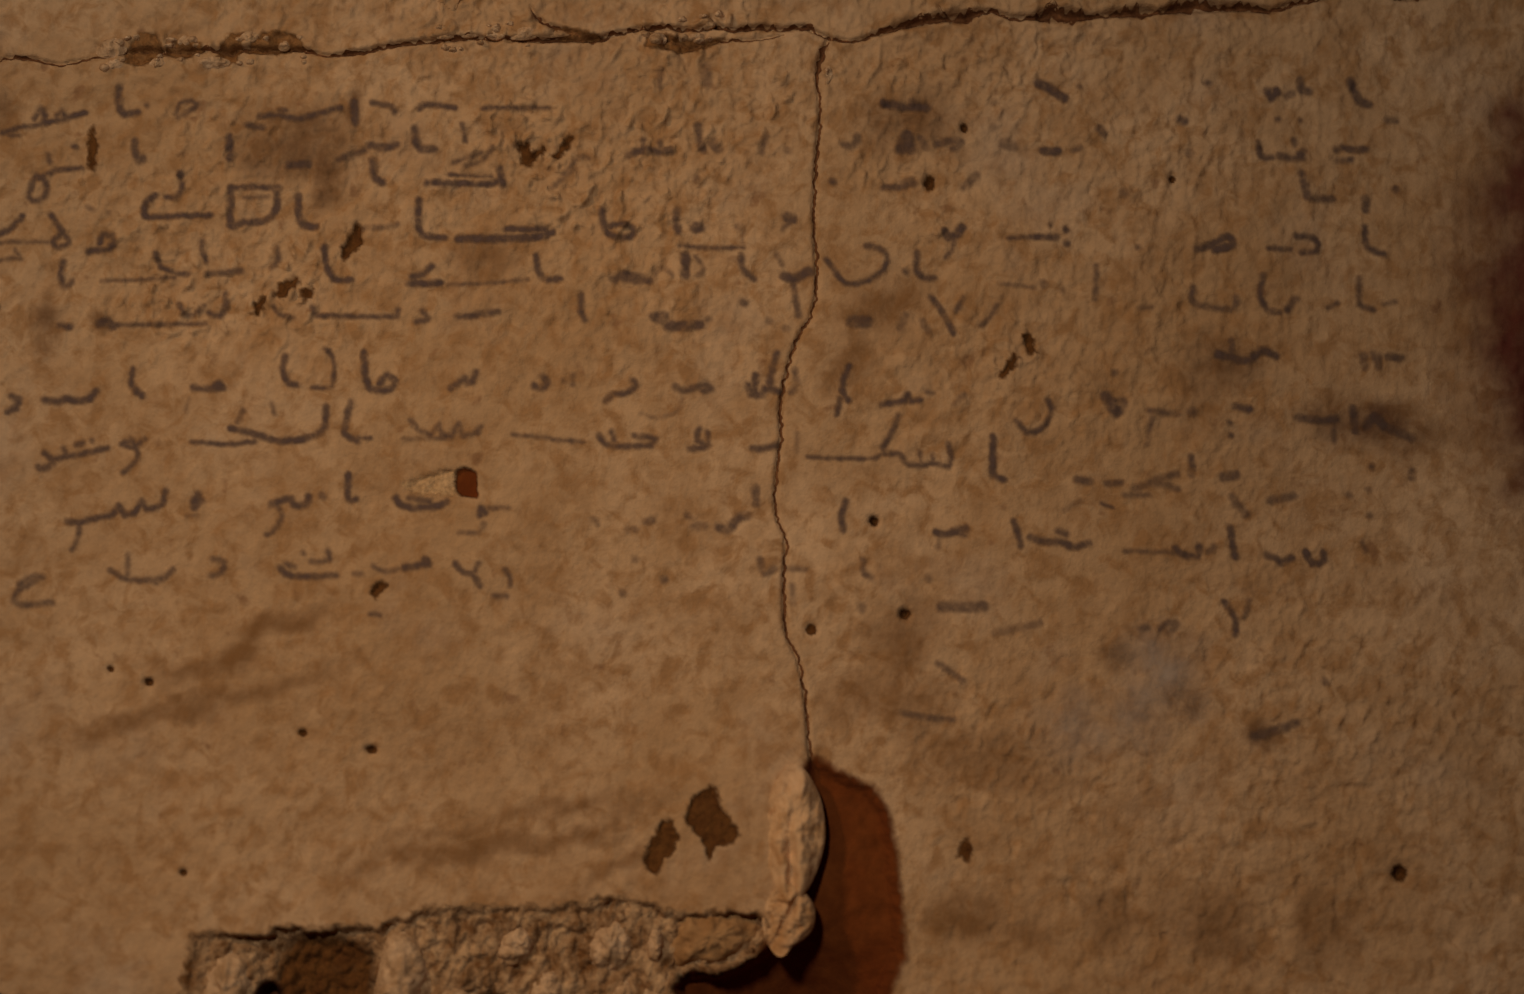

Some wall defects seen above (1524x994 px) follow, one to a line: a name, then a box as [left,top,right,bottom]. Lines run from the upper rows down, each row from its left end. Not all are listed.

crack [0,0,1319,760]
spalling [177,756,907,994]
spalling [958,838,972,862]
spalling [1392,864,1406,881]